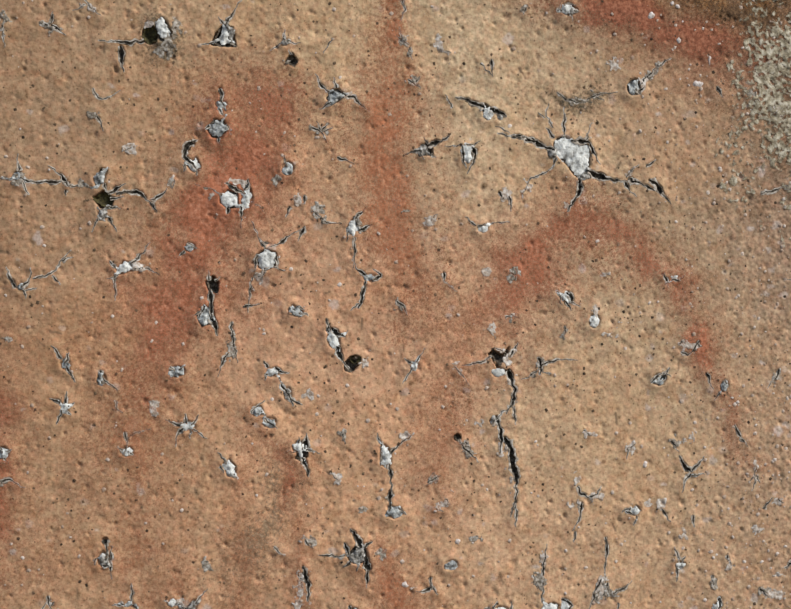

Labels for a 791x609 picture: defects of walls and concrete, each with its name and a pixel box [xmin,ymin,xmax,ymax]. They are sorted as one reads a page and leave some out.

leakage [534,0,791,211]
crack [192,271,238,377]
crack [326,318,350,370]
crack [402,348,425,384]
crack [452,342,578,527]
leakage [463,199,740,458]